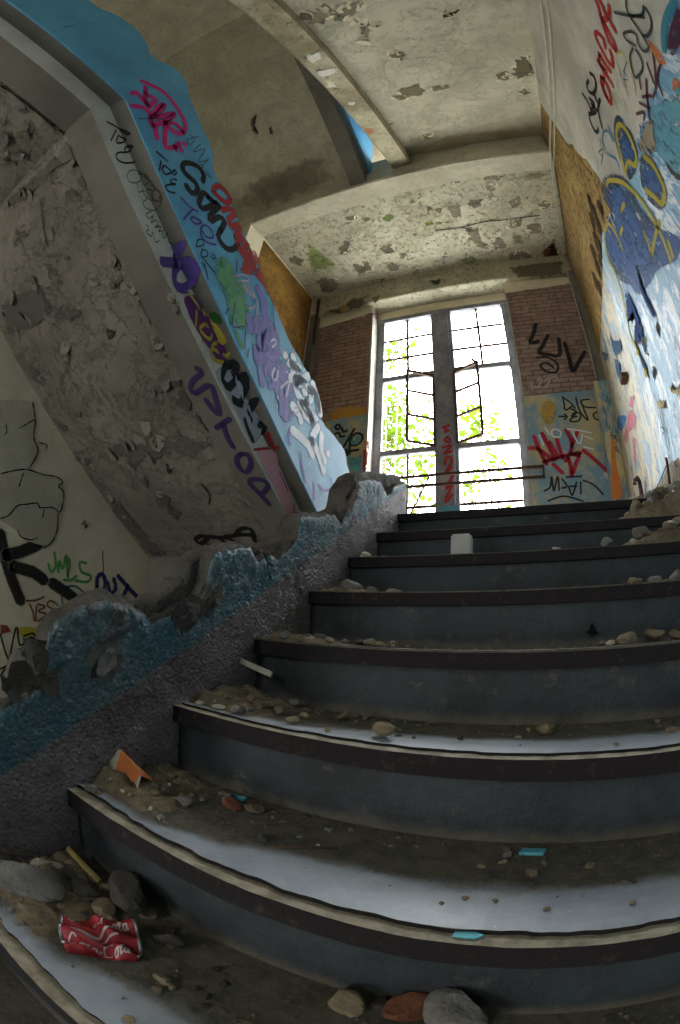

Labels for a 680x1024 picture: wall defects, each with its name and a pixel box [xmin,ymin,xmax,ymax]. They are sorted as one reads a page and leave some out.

peeling [299,0,387,46]
peeling [303,52,338,88]
peeling [389,82,450,101]
peeling [496,55,535,96]
peeling [339,241,407,283]
crack [435,215,540,231]
spalling [424,108,621,377]
peeling [624,266,660,381]
peeling [89,253,219,520]
peeling [656,384,680,410]
peeling [0,399,65,548]
spalling [0,638,61,700]